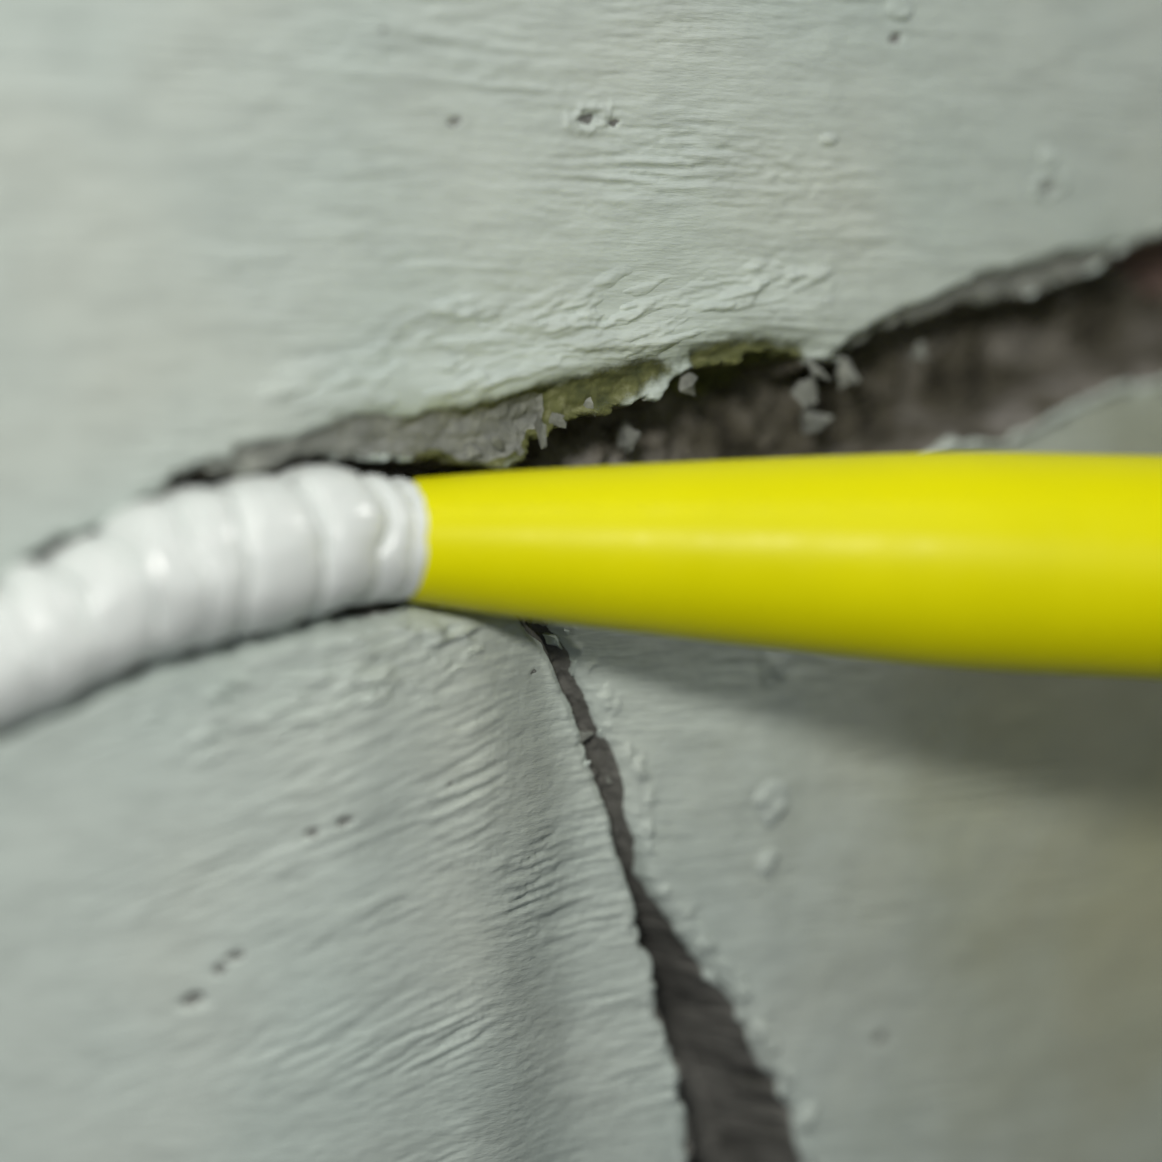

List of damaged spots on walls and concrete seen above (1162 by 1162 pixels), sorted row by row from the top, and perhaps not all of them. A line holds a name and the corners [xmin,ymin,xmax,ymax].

peeling [130,257,836,503]
crack [151,237,1162,500]
crack [22,527,95,562]
crack [73,661,147,699]
crack [180,599,439,657]
crack [517,618,803,1162]